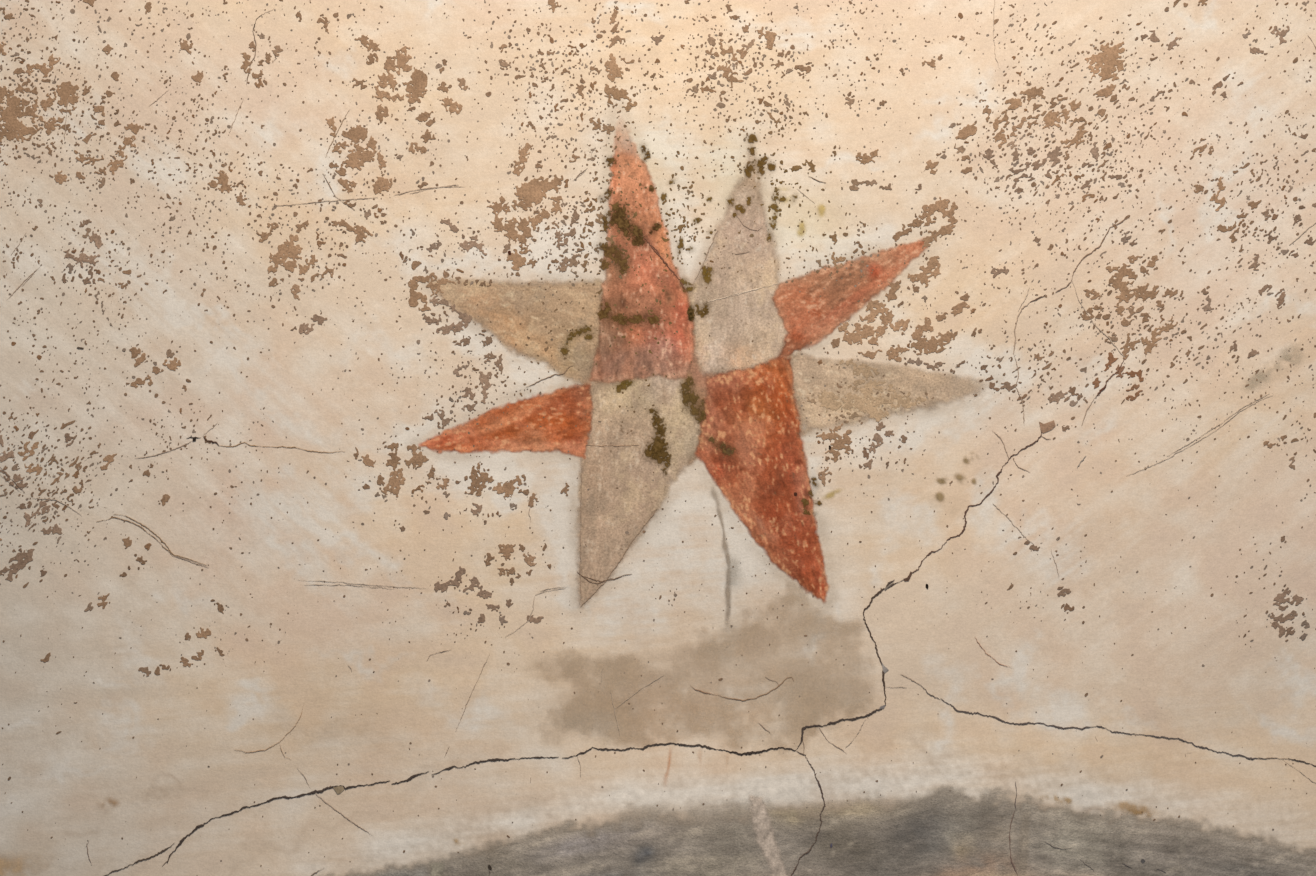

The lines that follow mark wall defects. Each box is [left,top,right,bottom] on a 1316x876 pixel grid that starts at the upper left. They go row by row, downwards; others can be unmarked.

peeling [0,0,1316,676]
crack [86,216,1316,876]
leakage [779,676,840,734]